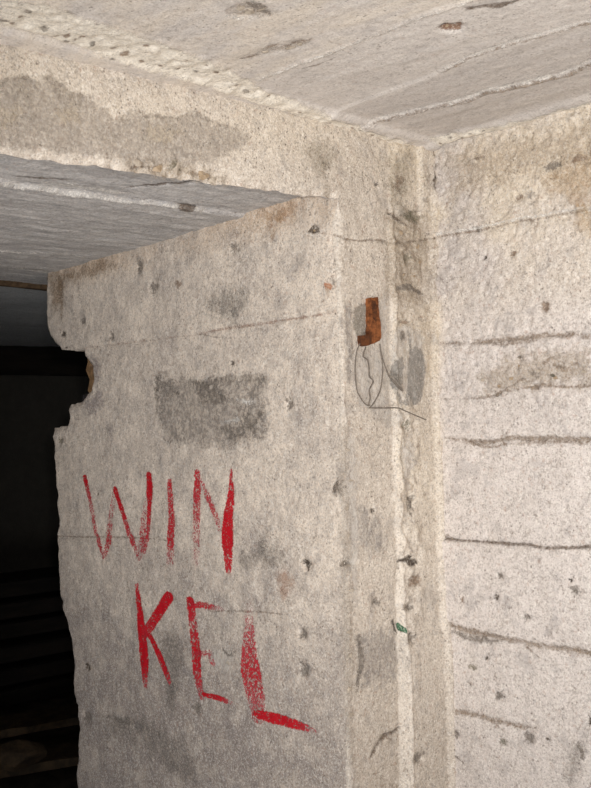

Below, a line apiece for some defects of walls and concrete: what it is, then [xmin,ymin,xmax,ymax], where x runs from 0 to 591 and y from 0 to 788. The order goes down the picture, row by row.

crack [481,332,587,347]
water stain [352,294,425,421]
water stain [156,373,269,446]
crack [448,435,591,448]
crack [445,534,591,550]
crack [451,622,591,656]